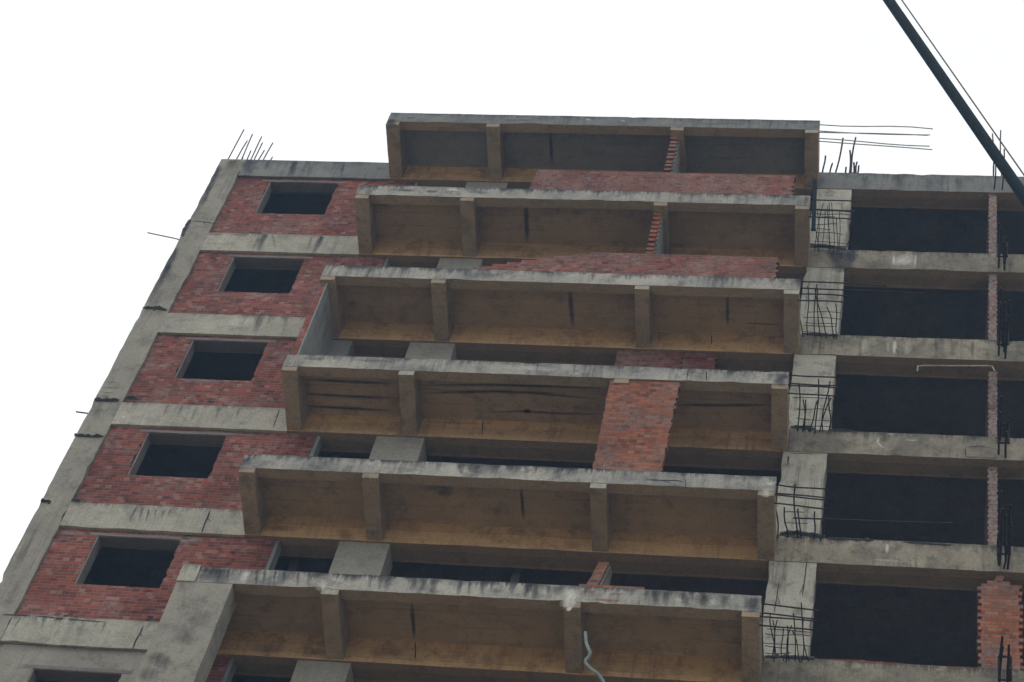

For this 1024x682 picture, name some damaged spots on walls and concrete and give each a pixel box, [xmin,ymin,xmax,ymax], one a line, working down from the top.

leakage [565,590,577,610]
crack [4,625,144,650]